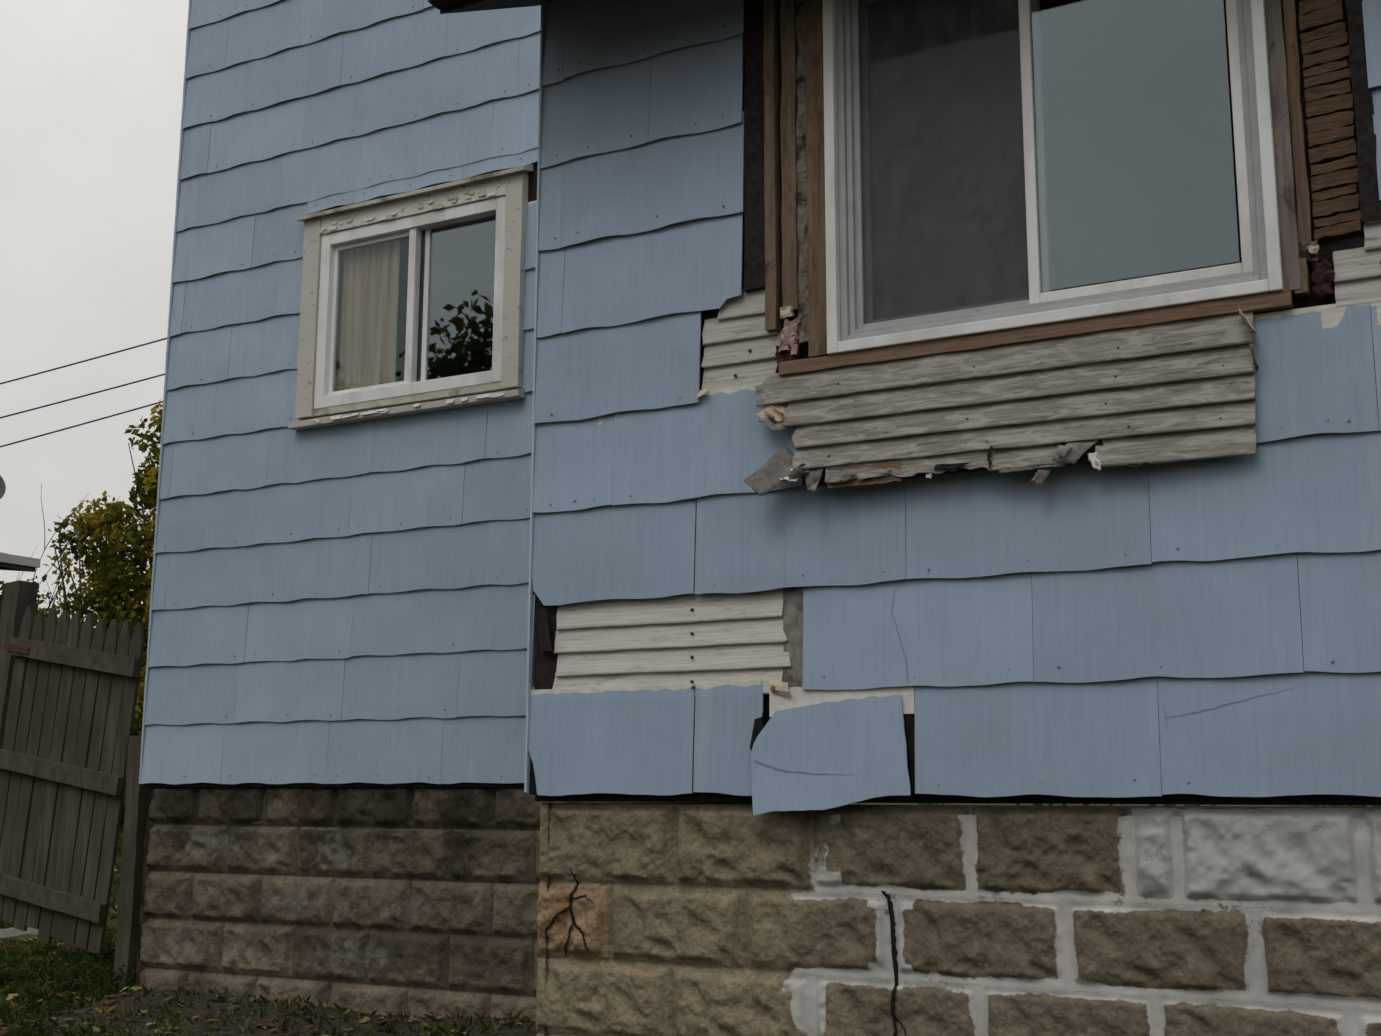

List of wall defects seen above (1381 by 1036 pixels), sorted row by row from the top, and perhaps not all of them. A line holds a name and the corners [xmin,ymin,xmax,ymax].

peeling [787,463,822,491]
crack [1162,688,1293,732]
crack [545,867,594,956]
crack [881,890,907,1036]